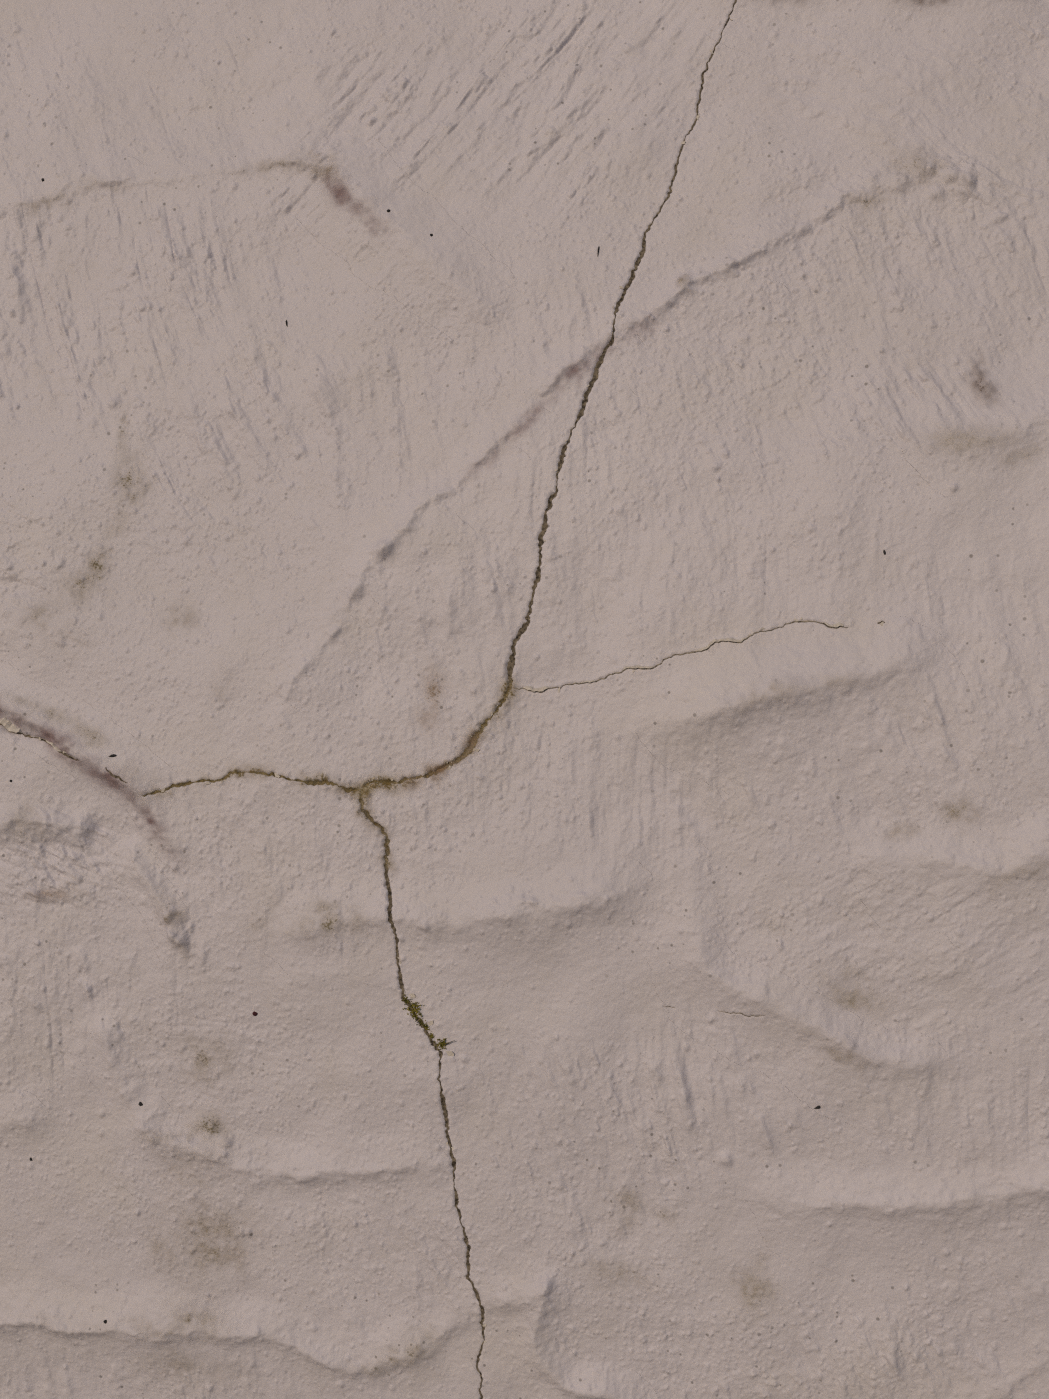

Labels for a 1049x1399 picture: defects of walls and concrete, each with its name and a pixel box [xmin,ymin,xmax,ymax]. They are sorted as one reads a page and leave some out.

crack [0,717,78,760]
crack [105,0,847,1399]